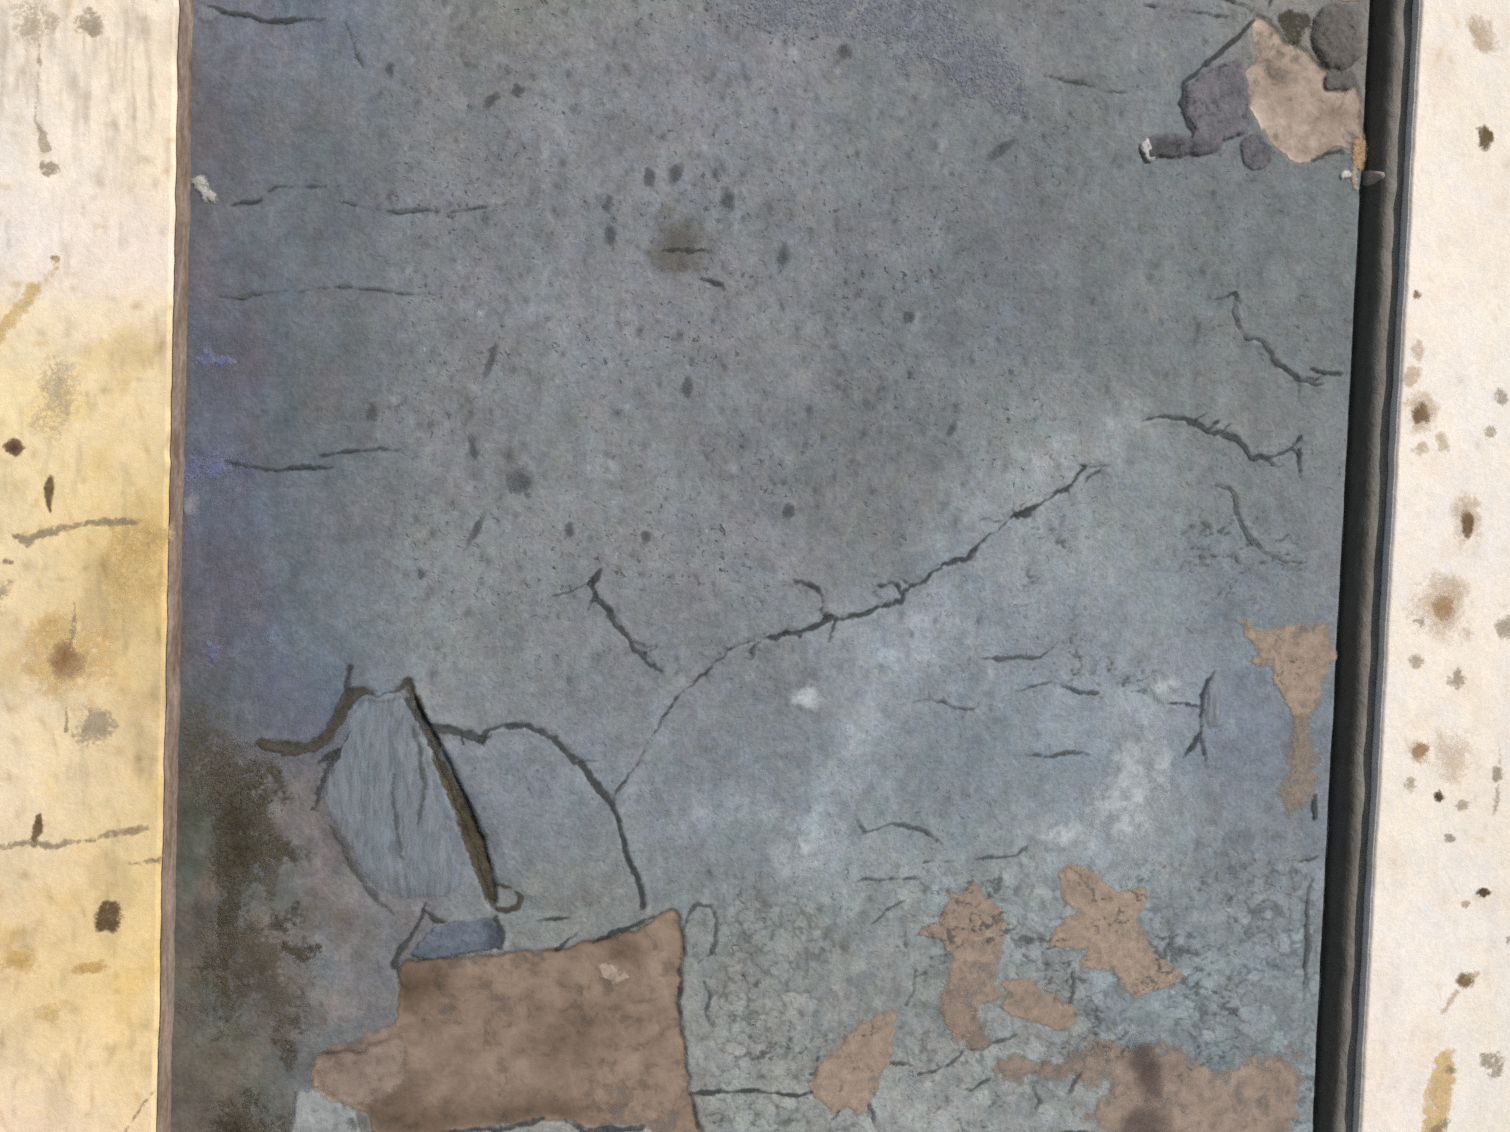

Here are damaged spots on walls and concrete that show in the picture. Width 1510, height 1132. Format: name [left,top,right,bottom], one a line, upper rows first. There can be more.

flaking render [1141,138,1155,162]
spalling [1245,17,1362,178]
crack [1219,291,1343,391]
crack [256,464,1106,969]
peeling [1237,619,1337,816]
mould [180,703,322,1071]
spalling [291,909,701,1132]
peeling [809,1010,897,1114]
peeling [920,882,1077,1050]
peeling [1050,864,1184,998]
peeling [993,1040,1300,1132]